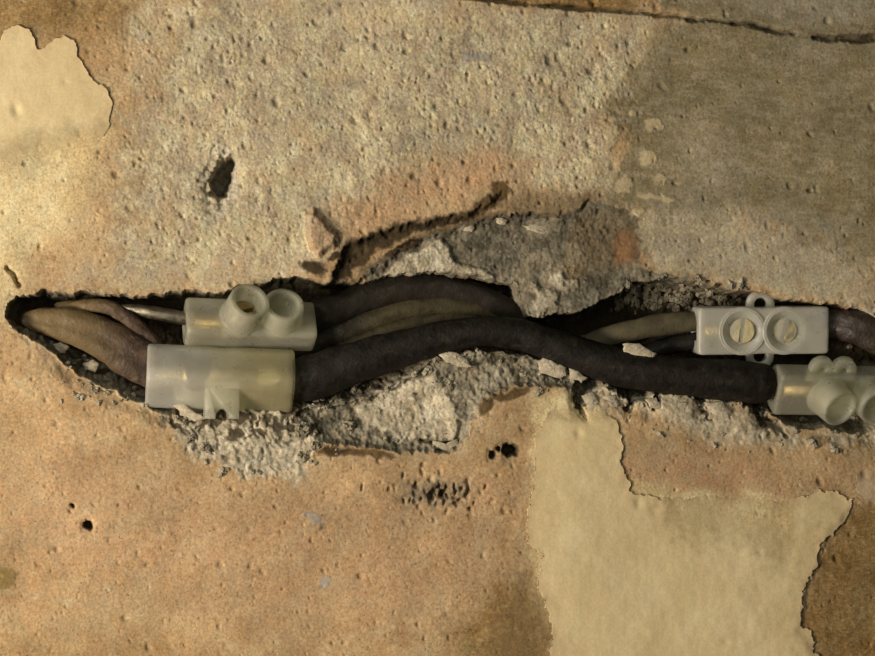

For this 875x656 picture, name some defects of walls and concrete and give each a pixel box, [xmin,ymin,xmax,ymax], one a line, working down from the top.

crack [475,0,875,44]
peeling [0,25,113,155]
peeling [629,110,664,132]
spalling [4,150,875,656]